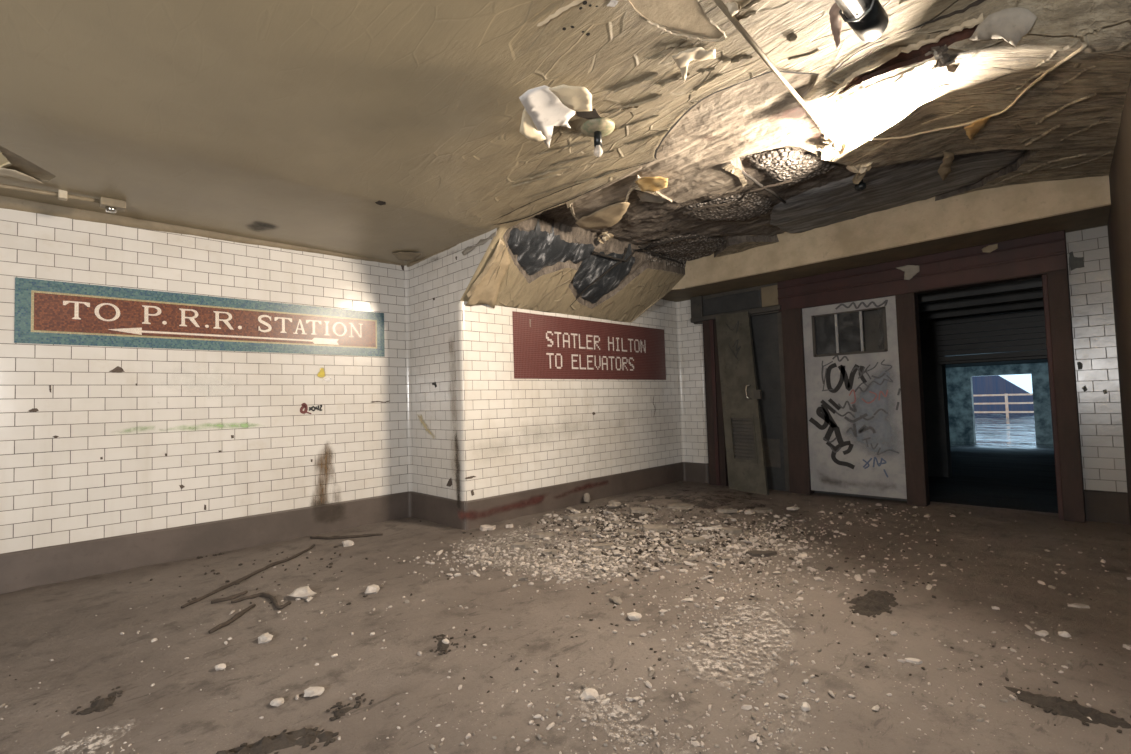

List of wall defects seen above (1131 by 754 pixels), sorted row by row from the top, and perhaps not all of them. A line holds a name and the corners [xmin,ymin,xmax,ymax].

peeling [0,146,56,183]
spalling [455,0,1113,309]